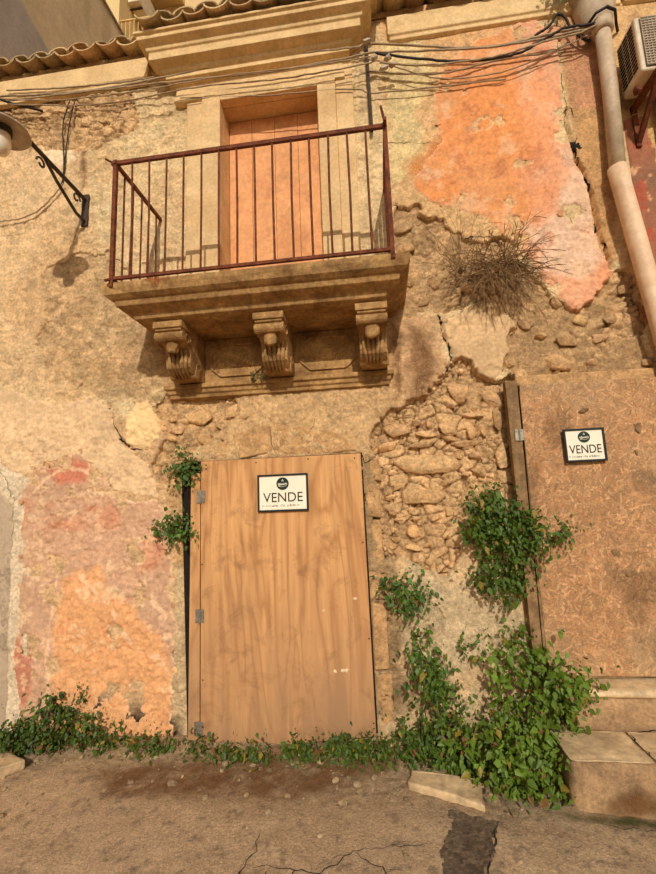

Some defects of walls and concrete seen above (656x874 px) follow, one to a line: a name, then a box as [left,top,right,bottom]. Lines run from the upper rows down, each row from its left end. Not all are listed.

crack [557,41,590,192]
crack [437,315,455,374]
peeling [371,19,656,576]
peeling [11,448,177,739]
crack [238,834,423,874]